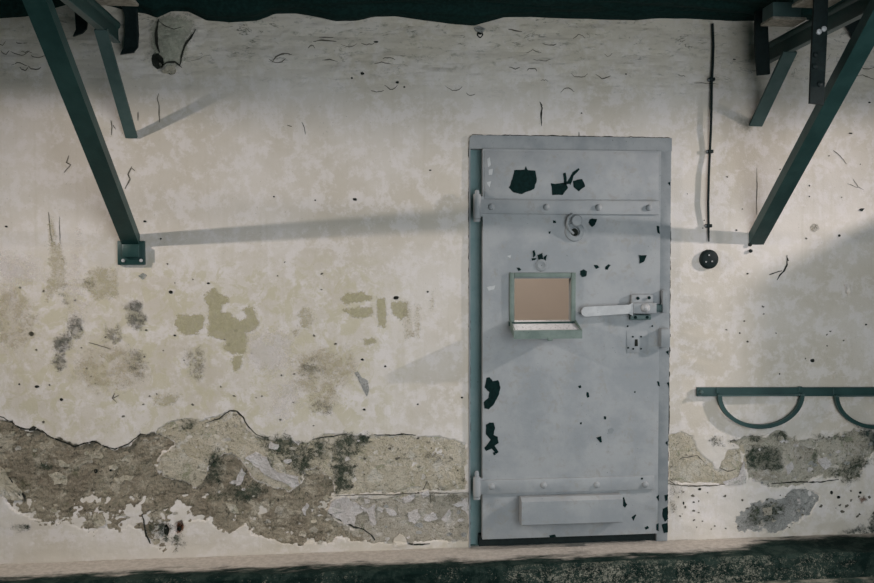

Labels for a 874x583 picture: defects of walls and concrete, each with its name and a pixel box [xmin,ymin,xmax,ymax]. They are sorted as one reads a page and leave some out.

leakage [52,318,83,371]
leakage [125,300,146,329]
flaking render [0,411,469,553]
flaking render [645,429,874,533]